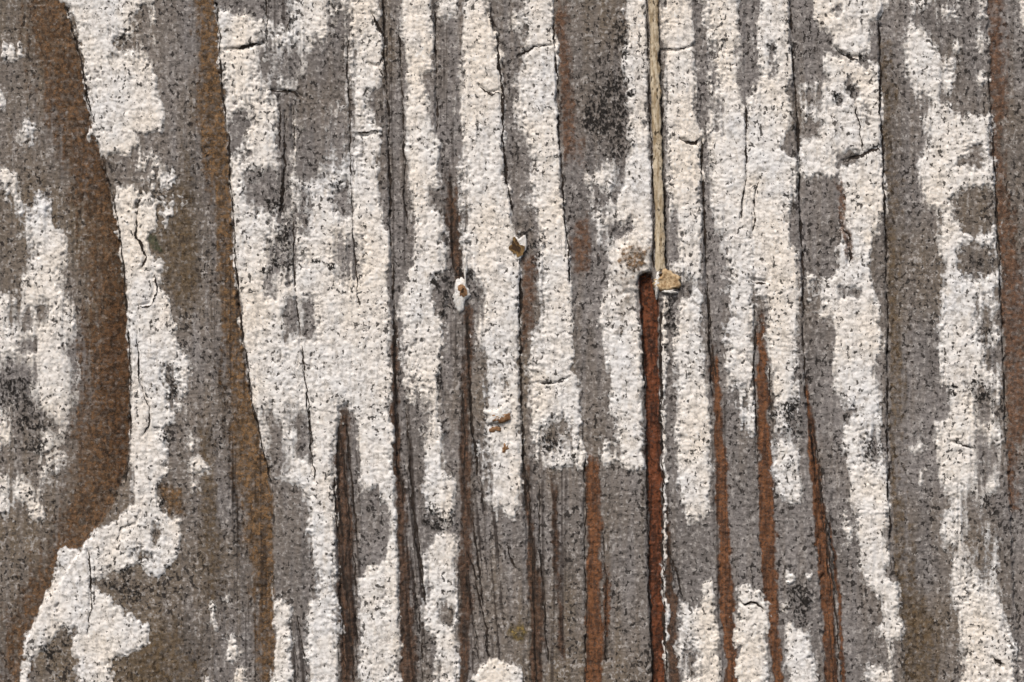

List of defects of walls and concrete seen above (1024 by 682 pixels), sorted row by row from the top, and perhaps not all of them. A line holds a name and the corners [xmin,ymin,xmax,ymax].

damp [0,0,130,682]
crack [346,0,426,679]
crack [480,13,570,282]
crack [507,276,568,682]
peeling [209,0,905,682]
damp [555,11,642,182]
corrosion [639,272,666,682]
damp [665,505,679,682]
corrosion [709,357,737,682]
corrosion [754,322,784,682]
corrosion [805,386,846,682]
crack [833,22,892,537]